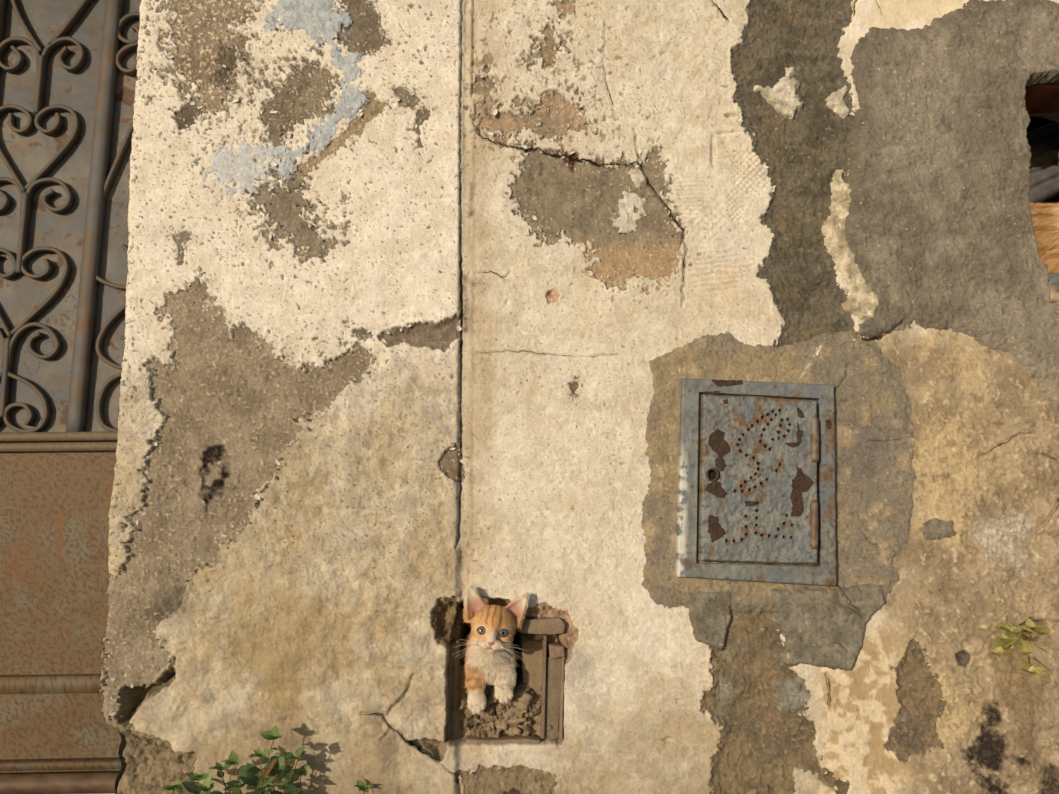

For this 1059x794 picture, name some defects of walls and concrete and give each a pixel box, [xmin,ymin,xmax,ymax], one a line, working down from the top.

peeling [152,0,430,265]
peeling [467,66,693,295]
crack [474,24,688,302]
peeling [102,268,462,794]
peeling [439,444,467,483]
crack [363,684,461,789]
water stain [964,702,1008,794]
water stain [1041,764,1059,794]